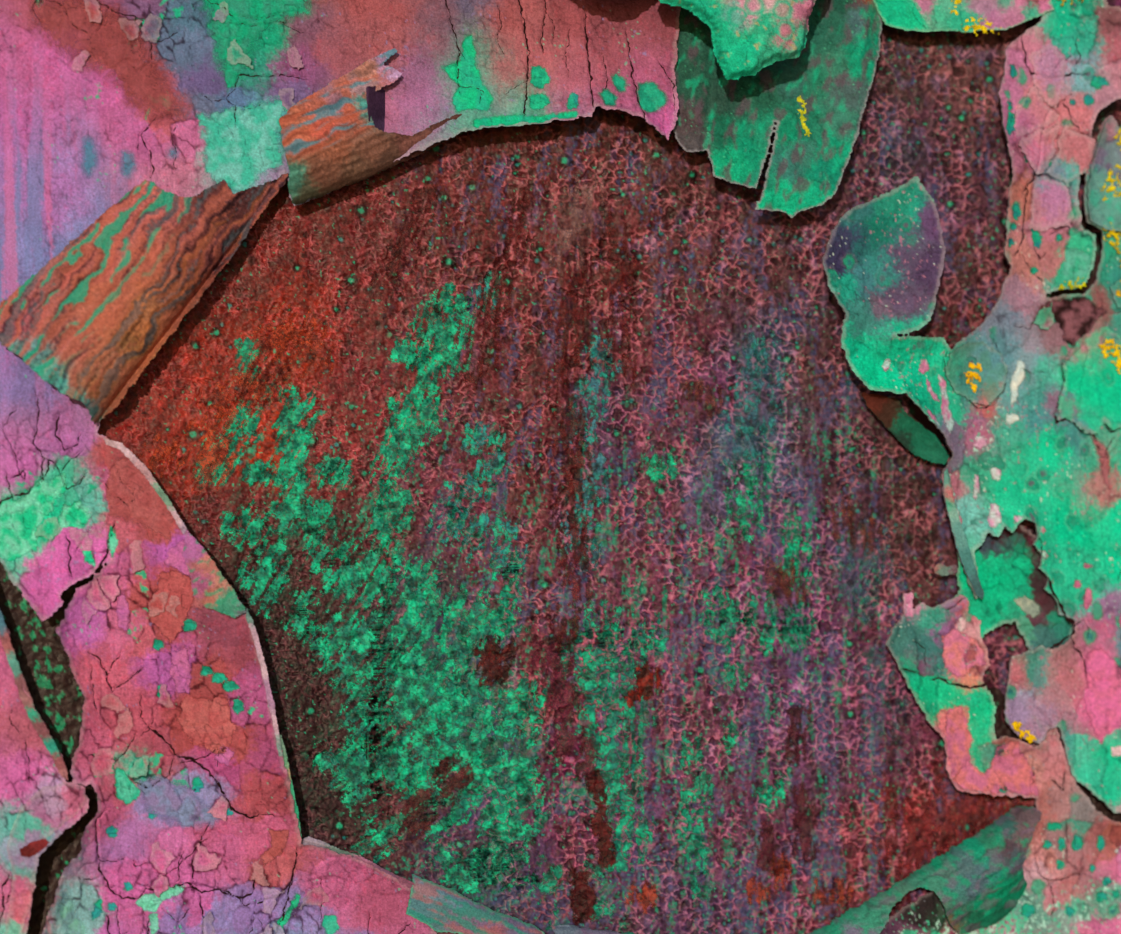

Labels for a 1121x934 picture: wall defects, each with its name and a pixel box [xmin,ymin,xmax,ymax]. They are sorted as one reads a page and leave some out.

peeling [278,49,462,205]
crack [445,0,675,120]
peeling [658,0,882,218]
crack [1021,37,1115,138]
peeling [0,173,288,424]
corrosion [460,187,540,391]
crack [972,173,1121,468]
crack [0,389,298,934]
corrosion [472,205,643,925]
corrosion [400,754,476,843]
peeling [808,795,1042,934]
corrosion [872,777,1030,882]